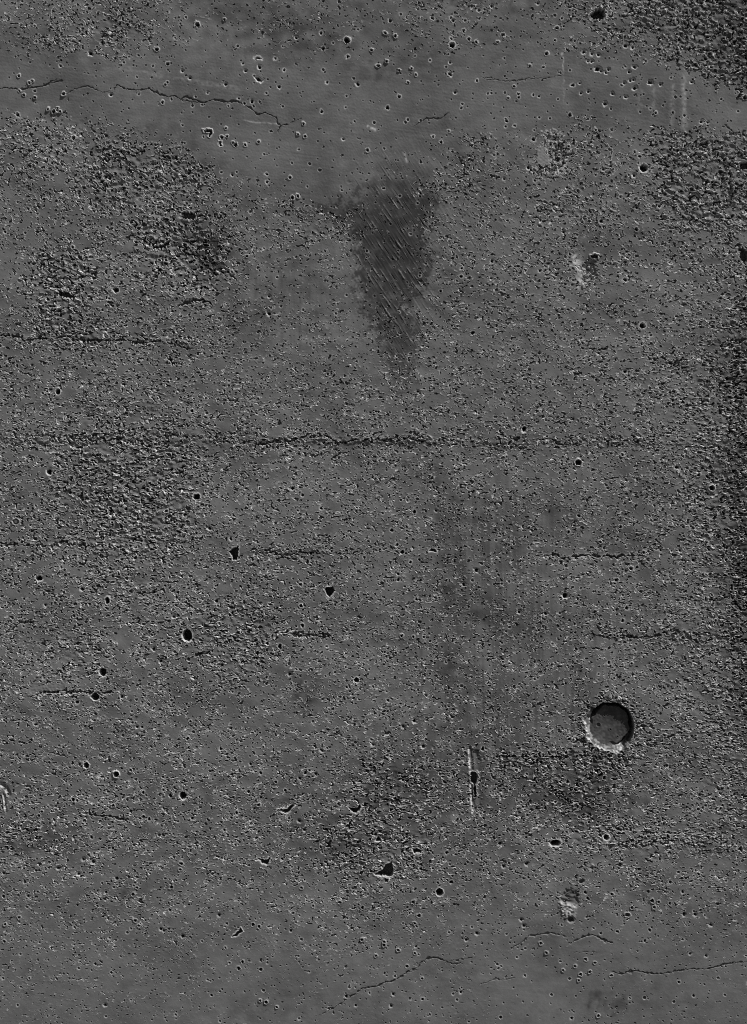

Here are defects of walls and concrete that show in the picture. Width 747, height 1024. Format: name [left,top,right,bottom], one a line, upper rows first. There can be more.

crack [0,79,302,133]
water stain [300,149,522,396]
water stain [567,227,604,291]
crack [1,427,434,461]
crack [552,440,583,448]
crack [509,932,747,976]
crack [320,956,475,1015]